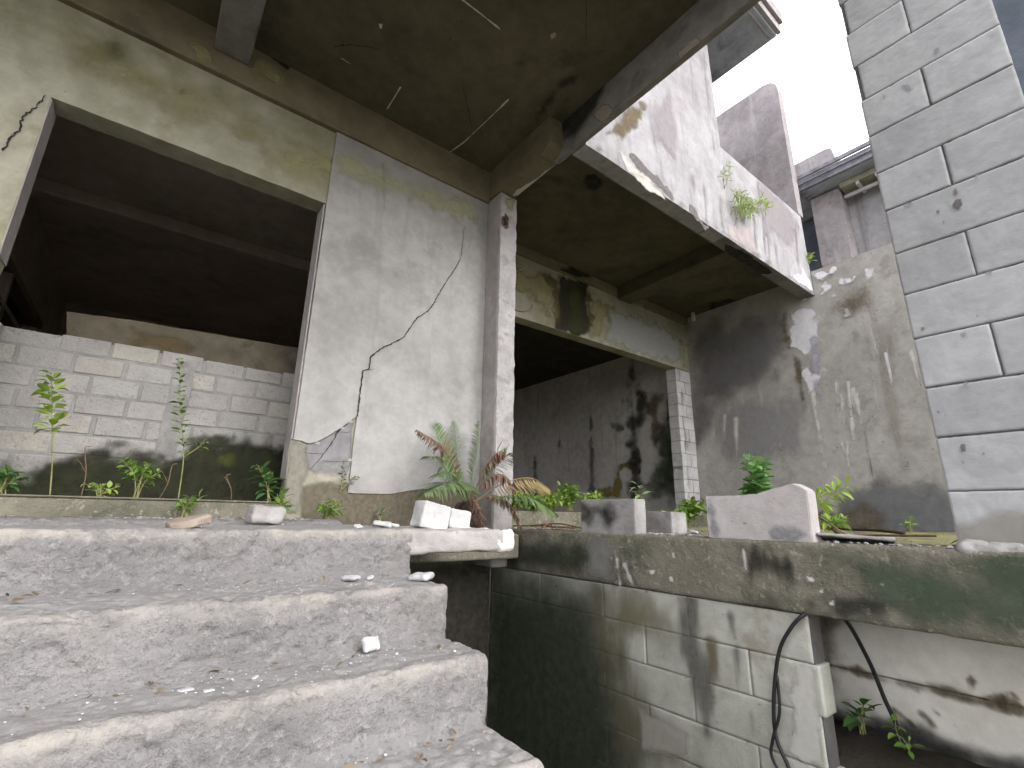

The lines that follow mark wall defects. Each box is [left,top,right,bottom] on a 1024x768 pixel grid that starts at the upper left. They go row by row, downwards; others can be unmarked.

crack [2,95,46,151]
spalling [621,153,673,200]
crack [357,228,465,416]
damp [543,266,595,336]
damp [607,313,804,458]
spalling [789,308,826,469]
flaking render [297,419,353,483]
damp [613,369,675,499]
damp [508,535,632,585]
damp [742,546,792,579]
damp [681,598,717,734]
damp [621,696,687,757]